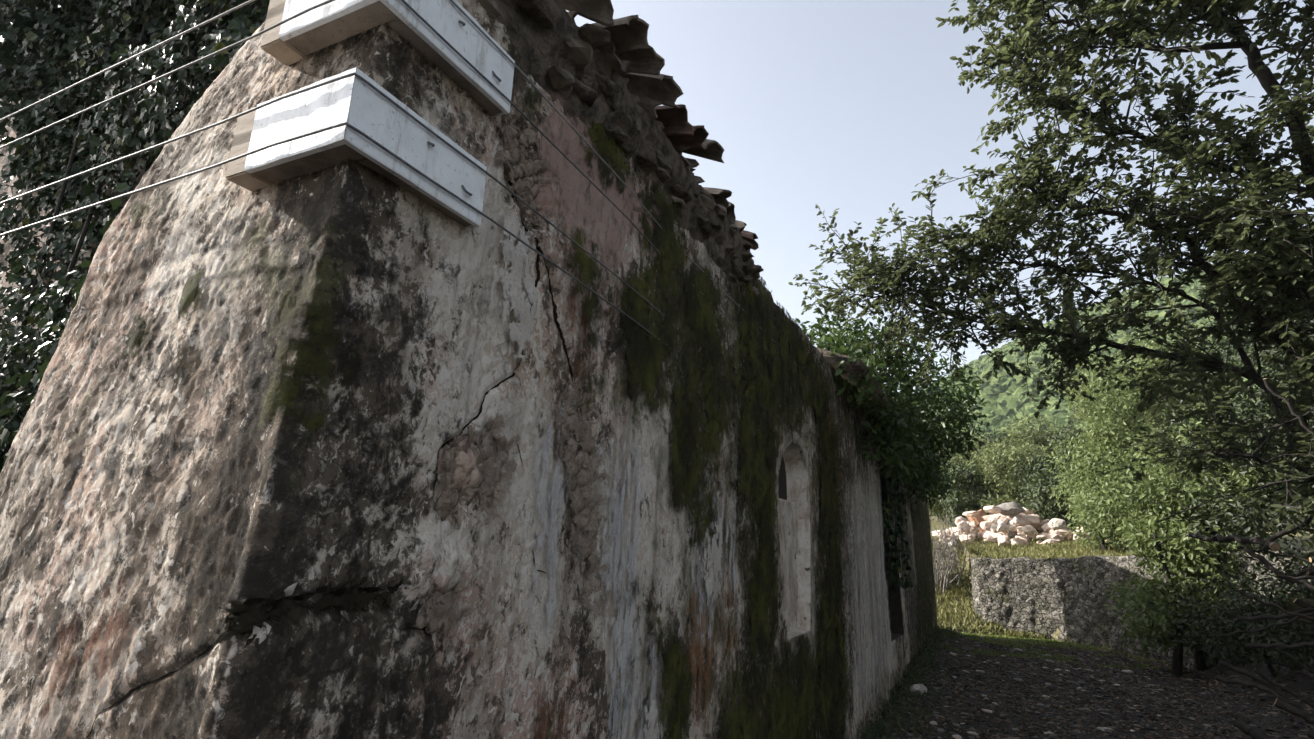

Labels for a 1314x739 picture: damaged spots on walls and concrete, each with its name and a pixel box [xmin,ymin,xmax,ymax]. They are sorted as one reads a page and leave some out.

crack [504,168,575,391]
leakage [127,207,422,739]
crack [434,342,525,488]
crack [86,587,386,739]
crack [400,625,432,636]
leakage [594,439,737,739]